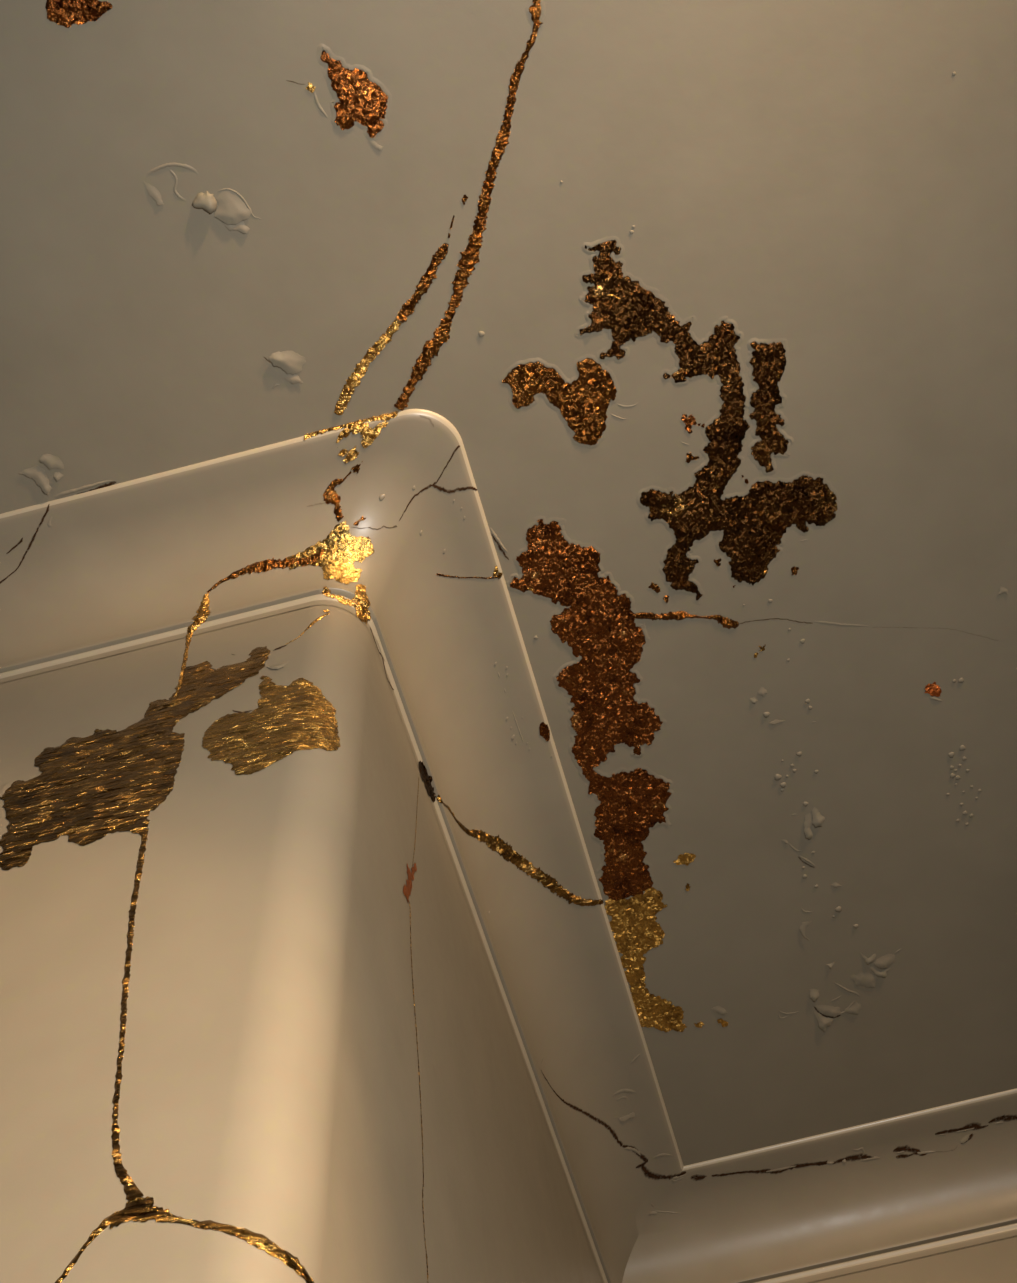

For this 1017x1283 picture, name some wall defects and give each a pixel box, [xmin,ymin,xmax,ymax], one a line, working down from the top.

peeling [144,163,263,234]
peeling [264,351,306,389]
crack [173,21,543,701]
peeling [19,454,64,495]
crack [0,480,116,583]
crack [633,611,870,629]
crack [55,828,314,1283]
crack [403,761,603,1279]
peeling [778,948,902,1032]
crack [543,1074,1017,1183]